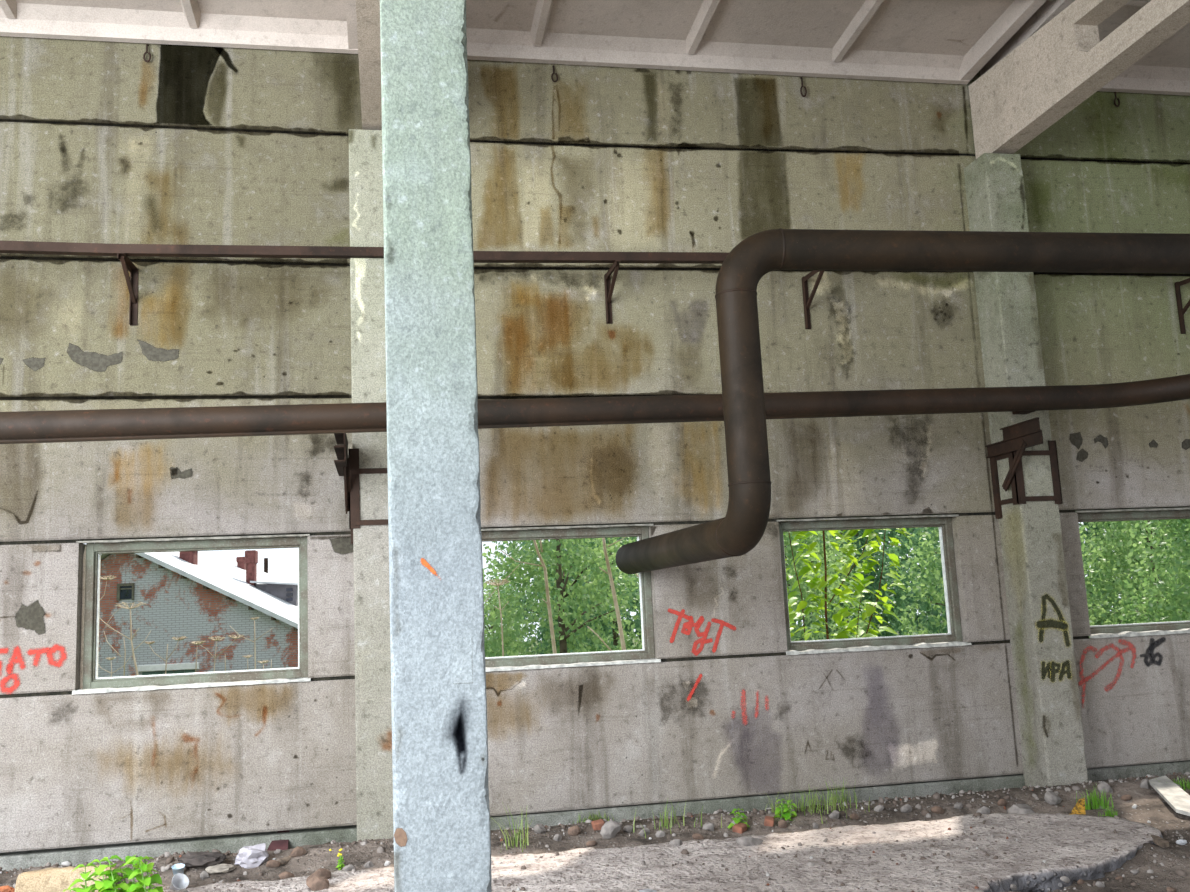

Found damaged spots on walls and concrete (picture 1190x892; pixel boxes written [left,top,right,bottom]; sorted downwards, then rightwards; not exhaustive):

peeling [1069,432,1108,462]